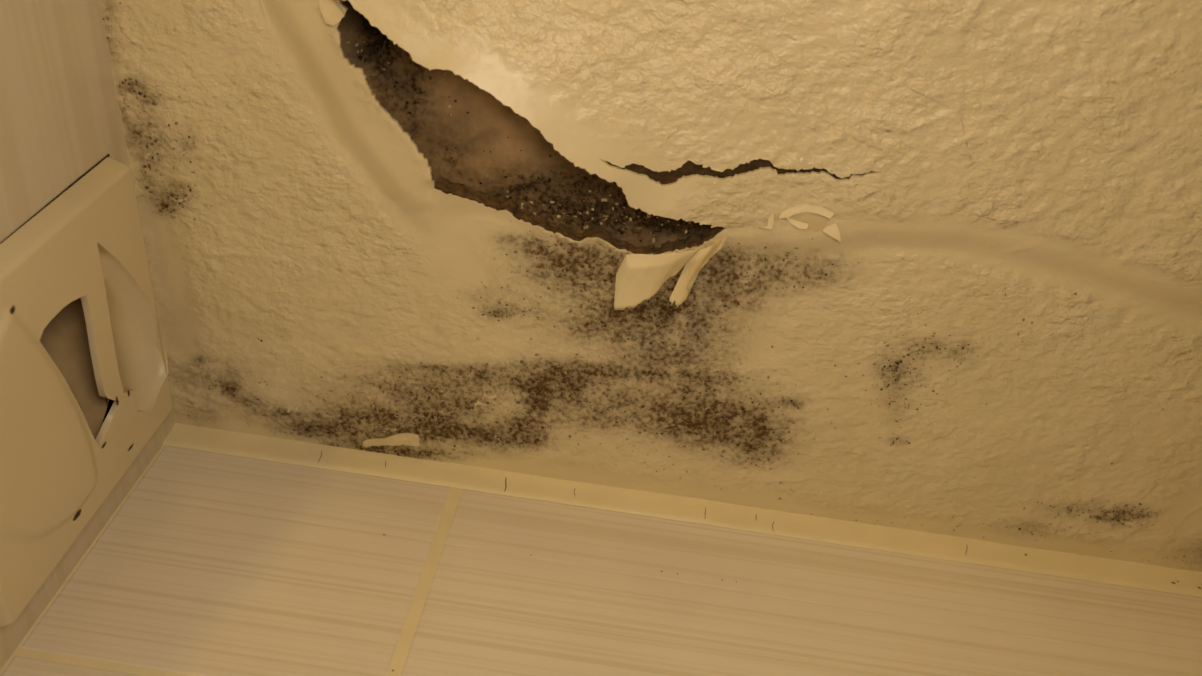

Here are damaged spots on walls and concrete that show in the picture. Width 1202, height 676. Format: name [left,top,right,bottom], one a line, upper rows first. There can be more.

spalling [318,0,728,310]
crack [605,159,876,184]
peeling [761,204,841,242]
mould [305,239,833,466]